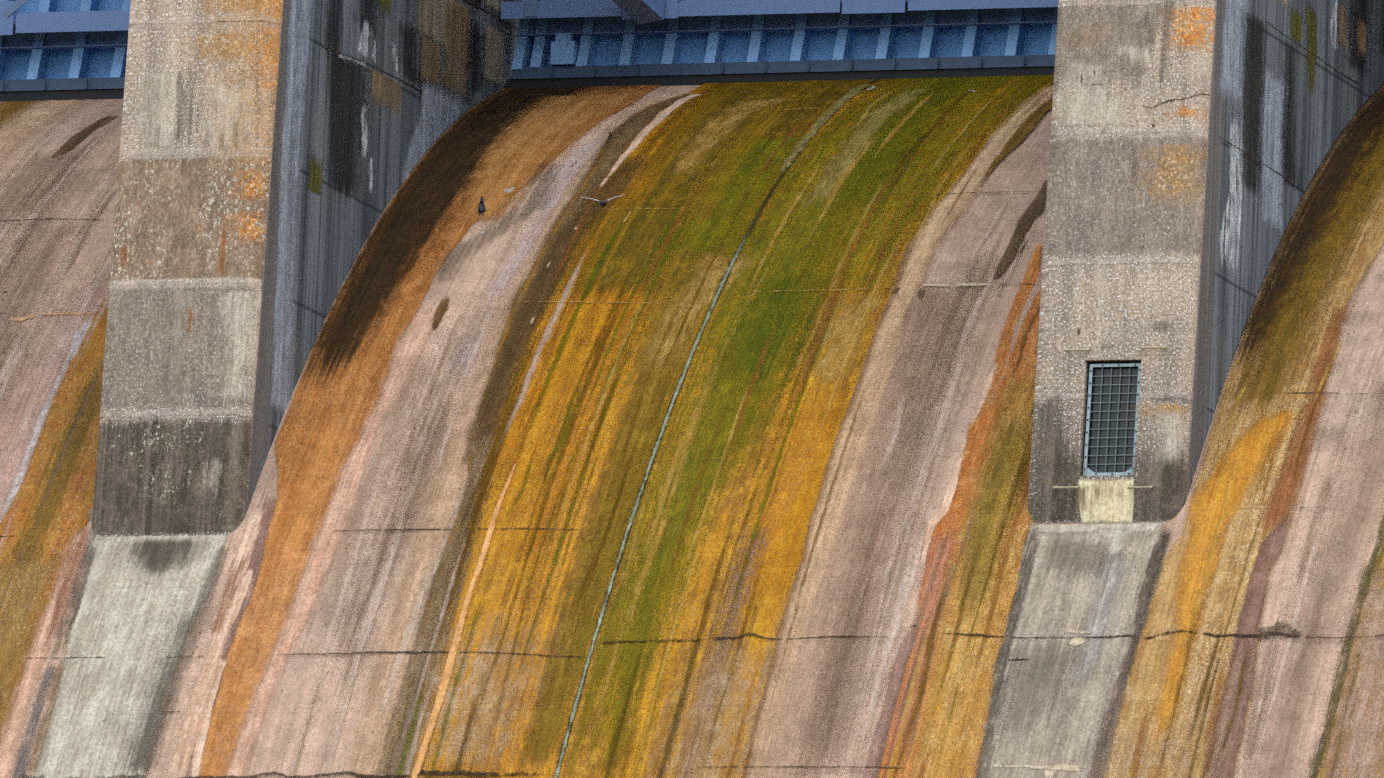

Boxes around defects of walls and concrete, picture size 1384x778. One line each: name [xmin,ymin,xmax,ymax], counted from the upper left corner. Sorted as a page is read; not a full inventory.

damp [1119,45,1149,62]
damp [675,99,783,173]
damp [645,256,745,361]
damp [748,63,1122,778]
damp [0,498,275,778]
crack [281,625,915,657]
crack [947,620,1384,661]
crack [22,770,143,778]
crack [179,769,538,778]